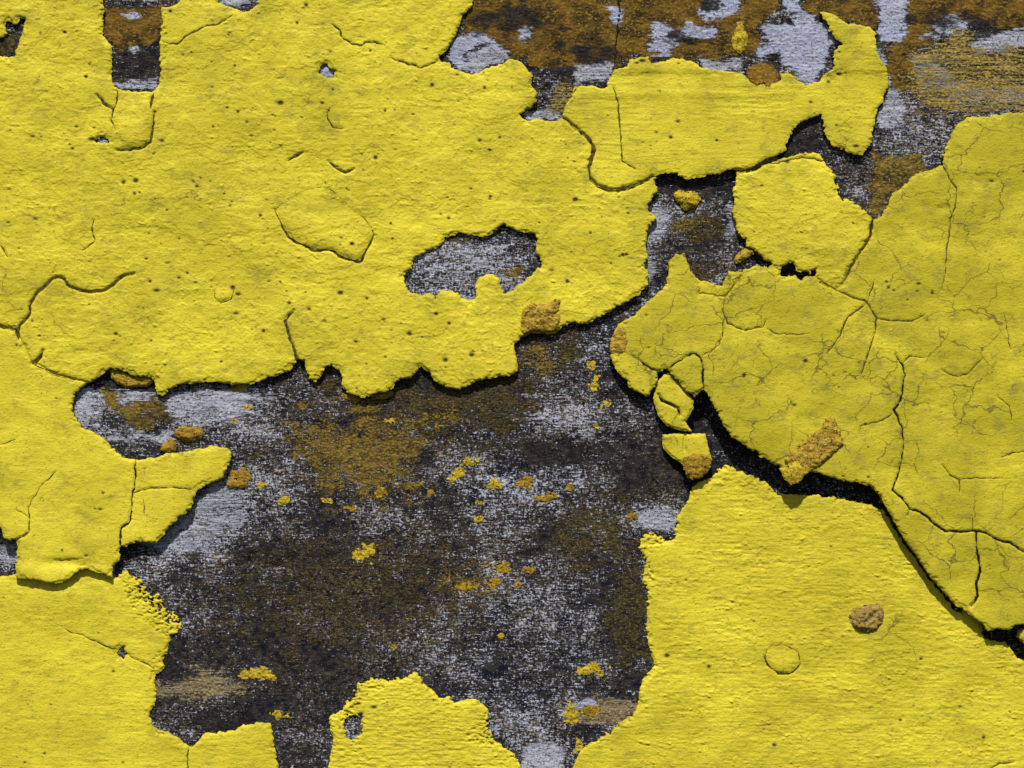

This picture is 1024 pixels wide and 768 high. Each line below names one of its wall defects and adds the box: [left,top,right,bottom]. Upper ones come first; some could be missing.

peeling [102,0,180,92]
crack [0,273,135,339]
peeling [403,224,542,300]
peeling [439,0,1024,344]
crack [736,153,791,172]
crack [820,219,924,374]
crack [942,166,957,287]
crack [119,459,191,545]
peeling [0,308,712,768]
crack [633,311,1024,659]